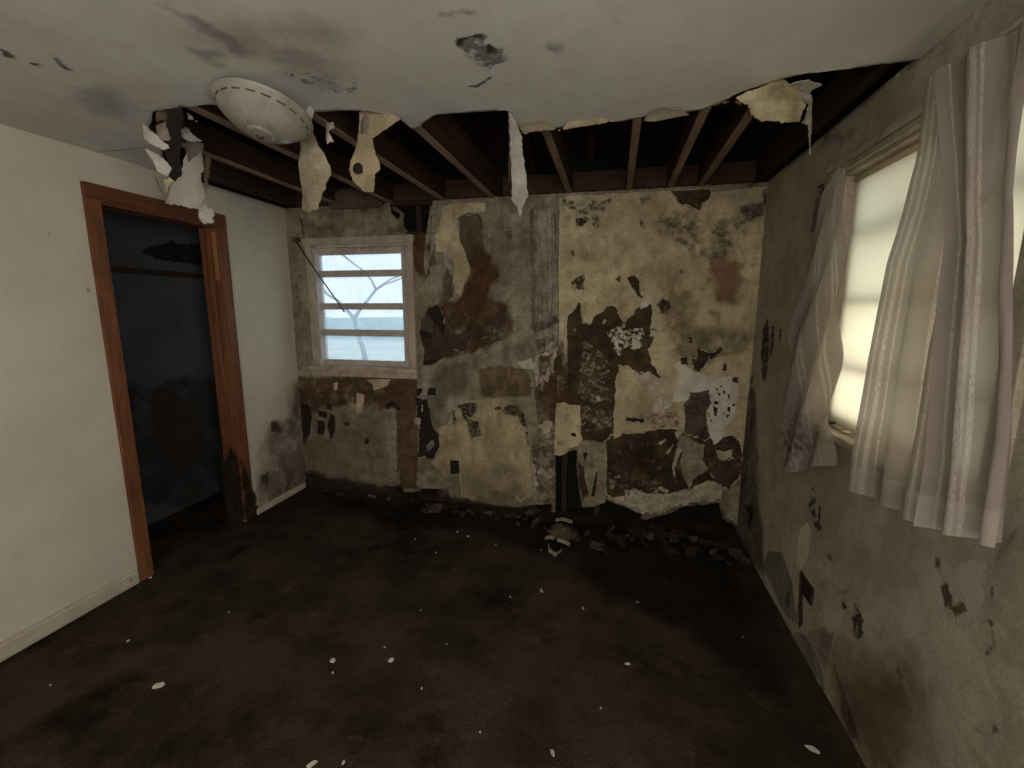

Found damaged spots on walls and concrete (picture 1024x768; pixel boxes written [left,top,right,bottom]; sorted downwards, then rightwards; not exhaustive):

mould [456,34,504,88]
mould [563,198,611,227]
spalling [671,188,712,210]
damp [664,189,767,255]
flaking render [419,202,487,365]
corrosion [450,248,499,338]
damp [571,274,585,290]
flaking render [517,200,743,526]
spalling [301,379,391,441]
flaking render [414,388,440,460]
damp [128,376,783,692]
peeling [763,522,833,690]